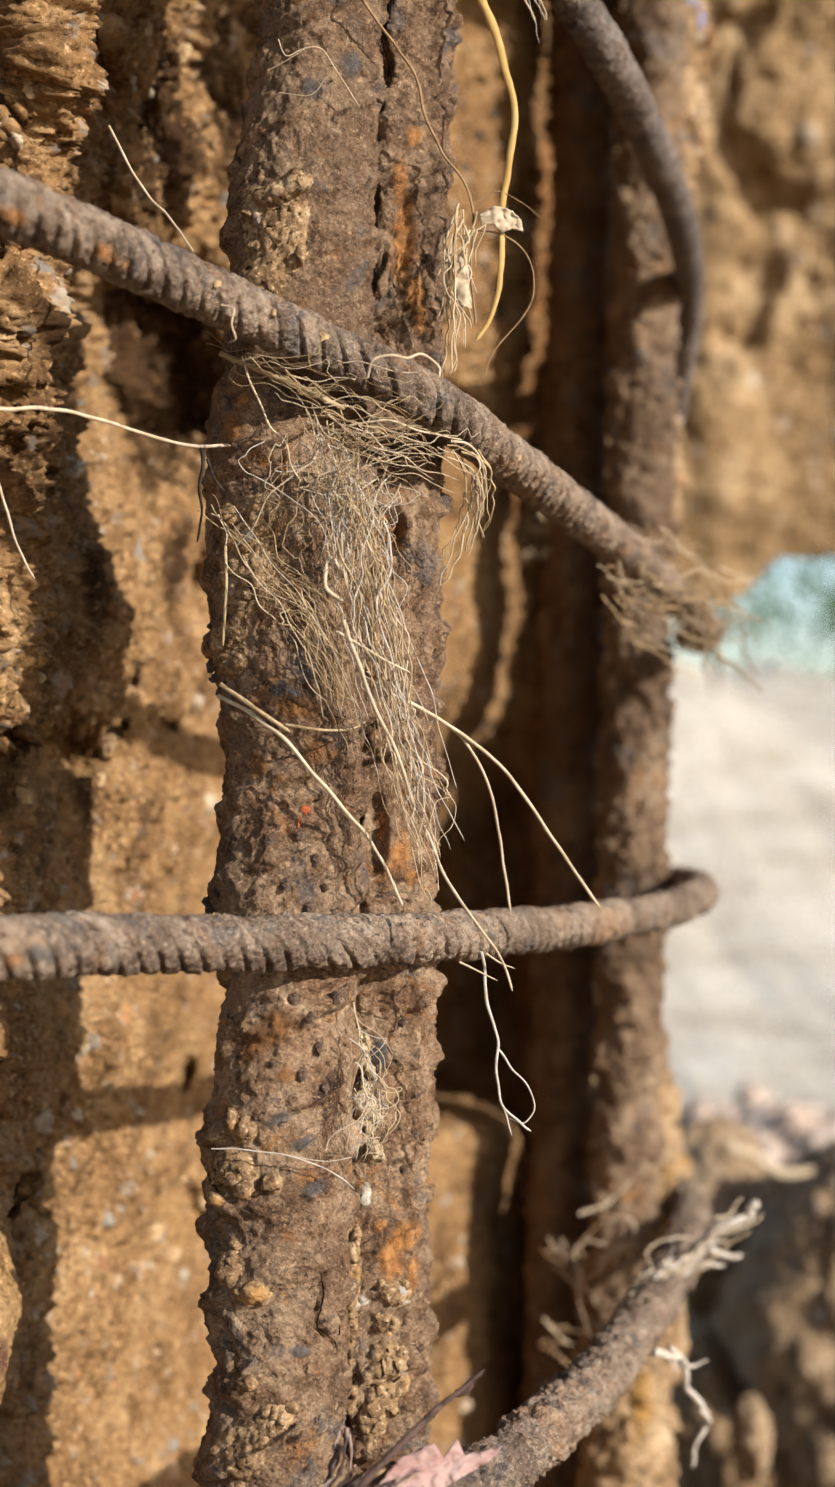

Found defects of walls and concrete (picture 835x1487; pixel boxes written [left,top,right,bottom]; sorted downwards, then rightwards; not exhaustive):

spalling [219,0,464,376]
crack [371,248,386,286]
crack [378,33,390,83]
corrosion [524,58,557,406]
spalling [541,0,690,564]
corrosion [206,656,221,696]
spalling [198,332,453,917]
spalling [531,518,677,908]
corrosion [201,888,219,915]
corrosion [509,953,533,1043]
spalling [149,962,447,1487]
corrosion [376,1222,419,1285]